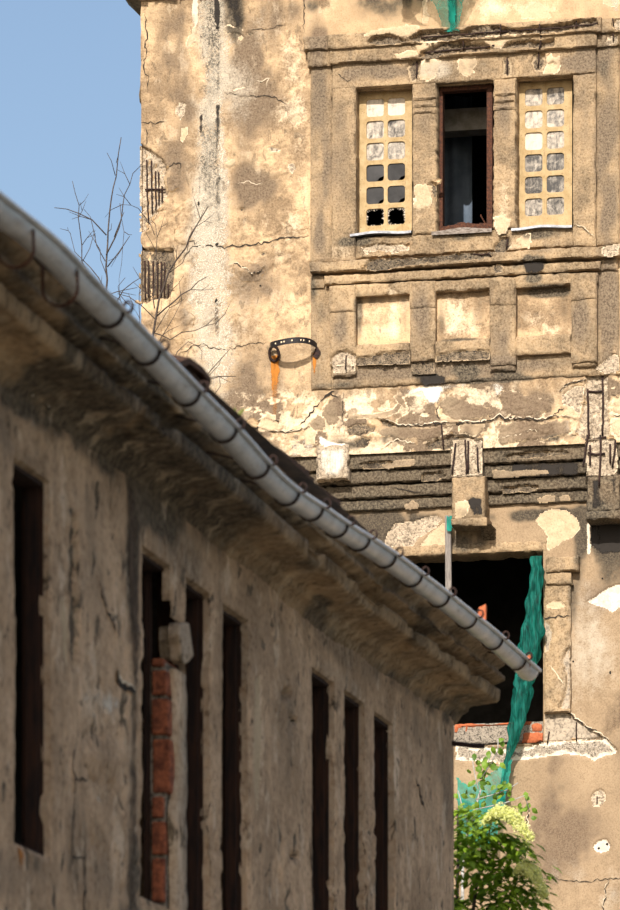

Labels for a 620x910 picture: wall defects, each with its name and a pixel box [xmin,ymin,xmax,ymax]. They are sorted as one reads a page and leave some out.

spalling [364,0,598,82]
damp [188,0,233,384]
flaking render [413,179,442,210]
corrosion [271,355,280,390]
spalling [303,349,620,550]
spalling [588,585,620,612]
crack [567,713,611,743]